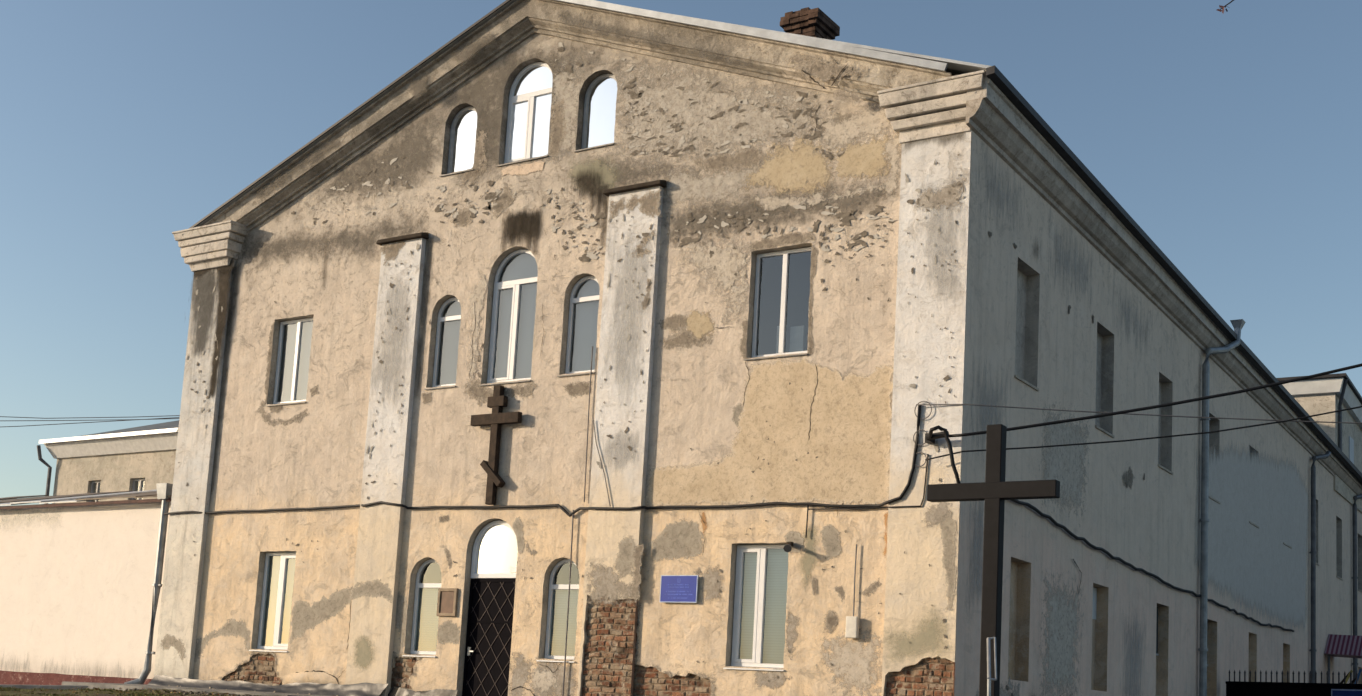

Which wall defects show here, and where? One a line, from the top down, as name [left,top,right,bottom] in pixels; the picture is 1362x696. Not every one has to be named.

leakage [503,211,540,251]
peeling [541,50,966,356]
leakage [192,221,431,491]
flaking render [739,320,769,366]
flaking render [564,366,642,469]
spalling [219,649,283,686]
spalling [390,651,422,691]
spalling [510,544,717,696]
peeling [694,567,723,600]
spalling [885,619,955,696]